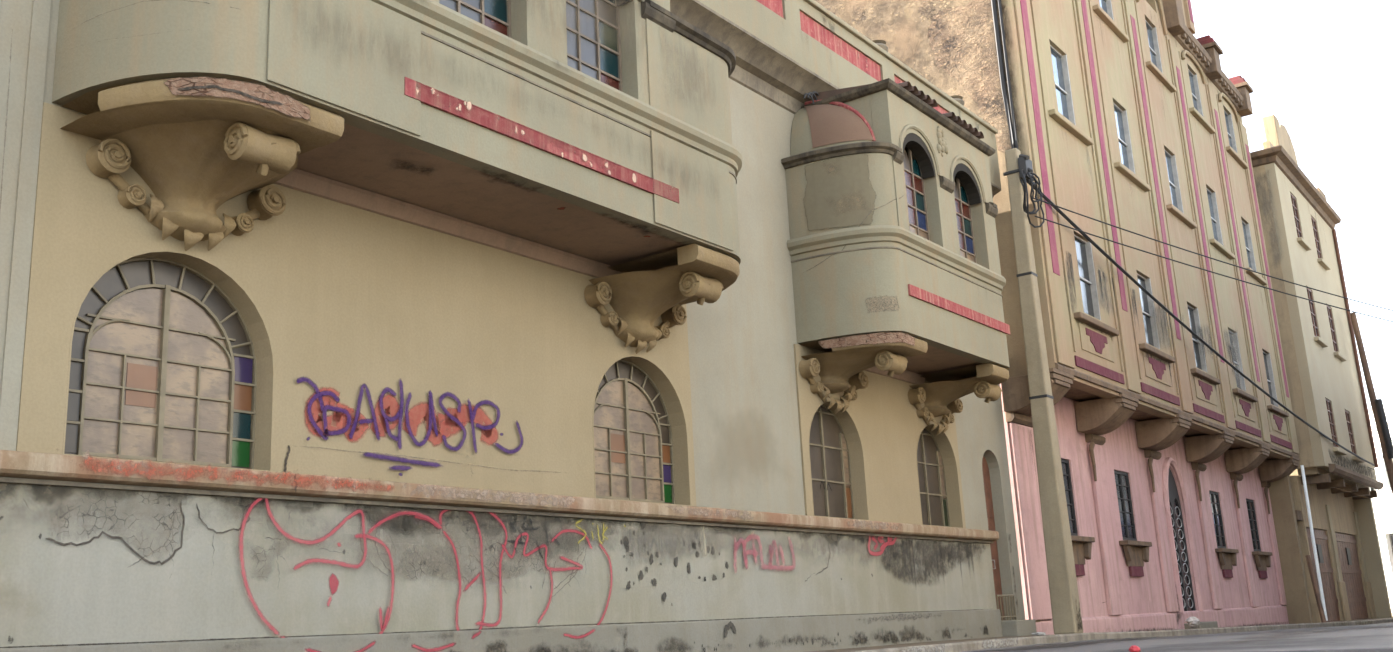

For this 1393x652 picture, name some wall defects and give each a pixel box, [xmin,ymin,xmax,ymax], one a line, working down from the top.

peeling [815,0,1018,152]
water stain [0,483,137,500]
water stain [211,495,754,555]
water stain [798,532,979,582]
water stain [486,642,506,652]